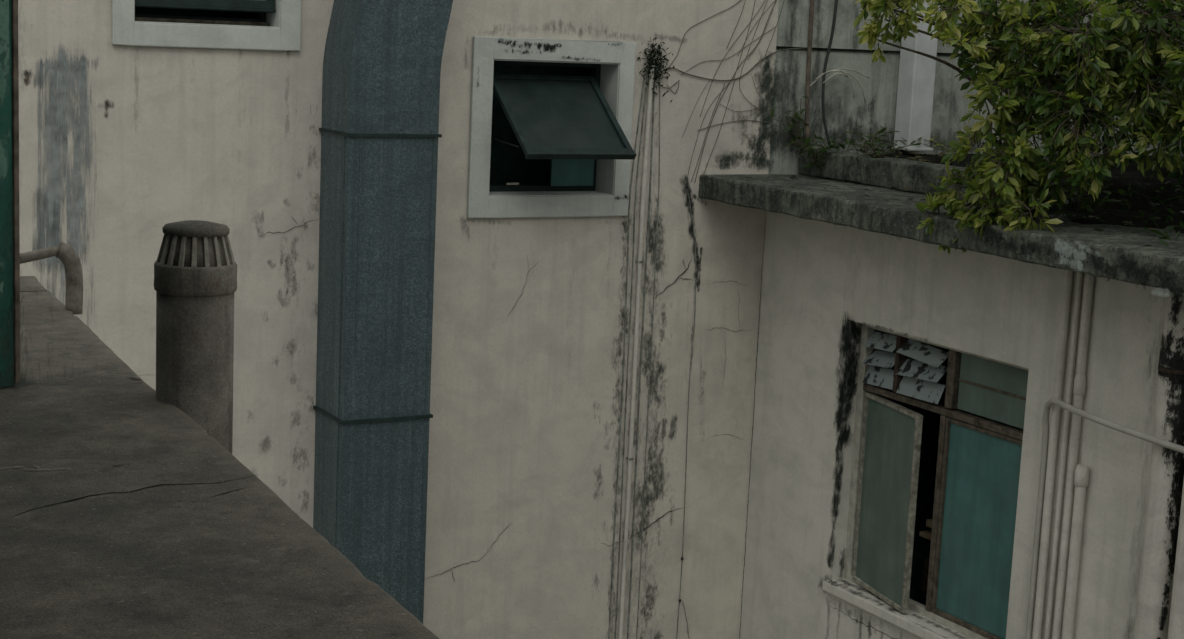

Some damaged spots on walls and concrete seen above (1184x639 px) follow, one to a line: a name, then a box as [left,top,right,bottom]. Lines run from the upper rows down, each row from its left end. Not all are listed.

peeling [0,0,10,106]
water stain [720,0,840,168]
peeling [0,130,10,178]
water stain [33,48,93,304]
water stain [646,221,663,280]
crack [12,475,255,517]
water stain [623,418,677,539]
crack [432,529,506,582]